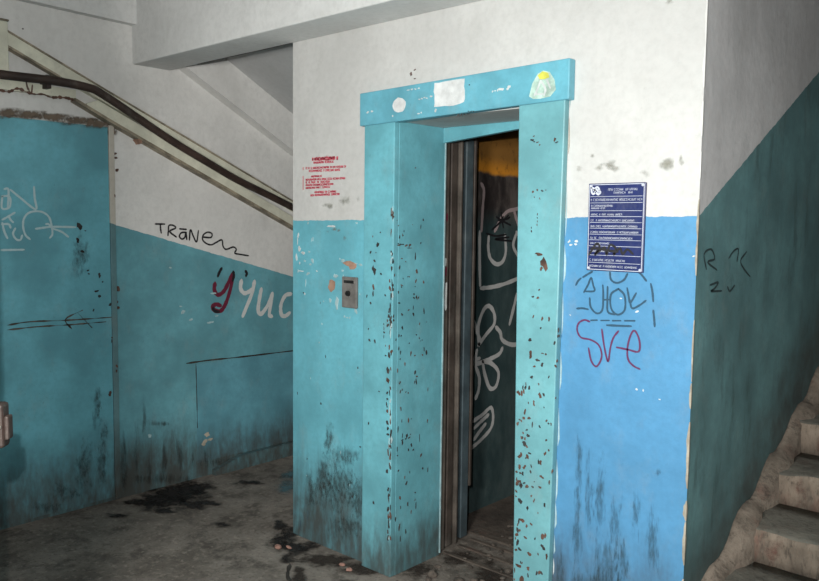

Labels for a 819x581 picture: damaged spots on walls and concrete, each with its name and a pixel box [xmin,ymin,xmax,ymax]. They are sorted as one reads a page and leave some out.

flaking render [0,108,117,134]
peeling [295,233,318,295]
corrosion [515,417,553,497]
leakage [124,478,220,513]
leakage [267,520,377,581]
leakage [405,563,431,577]
leakage [444,551,504,581]